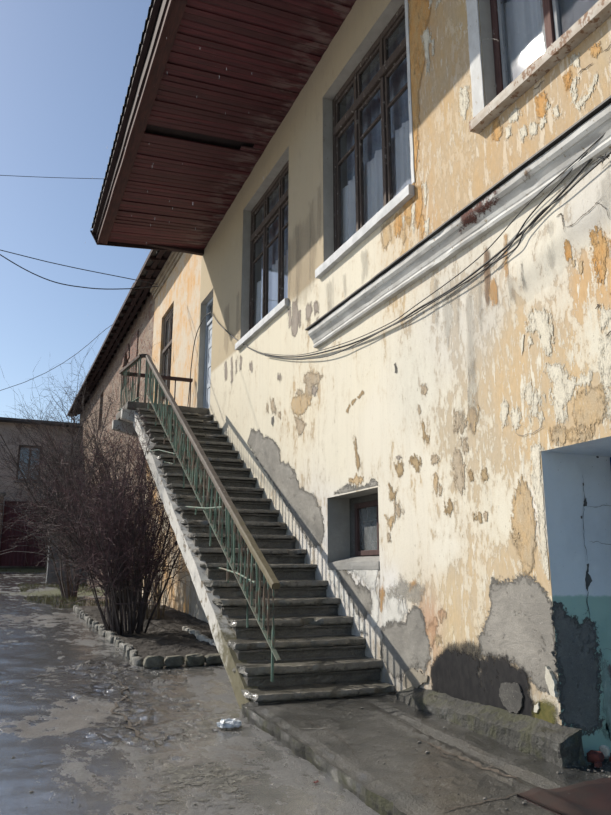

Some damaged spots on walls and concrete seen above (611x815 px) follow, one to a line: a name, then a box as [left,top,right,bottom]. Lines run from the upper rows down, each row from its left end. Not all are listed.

peeling [491,90,560,142]
rust [459,187,499,234]
crack [557,202,610,232]
peeling [564,225,611,285]
peeling [290,371,323,435]
flaking render [247,428,325,548]
flaking render [333,435,378,495]
peeling [385,453,454,542]
peeling [450,401,489,496]
flaking render [477,303,611,741]
flaking render [328,569,446,688]
water stain [430,641,535,718]